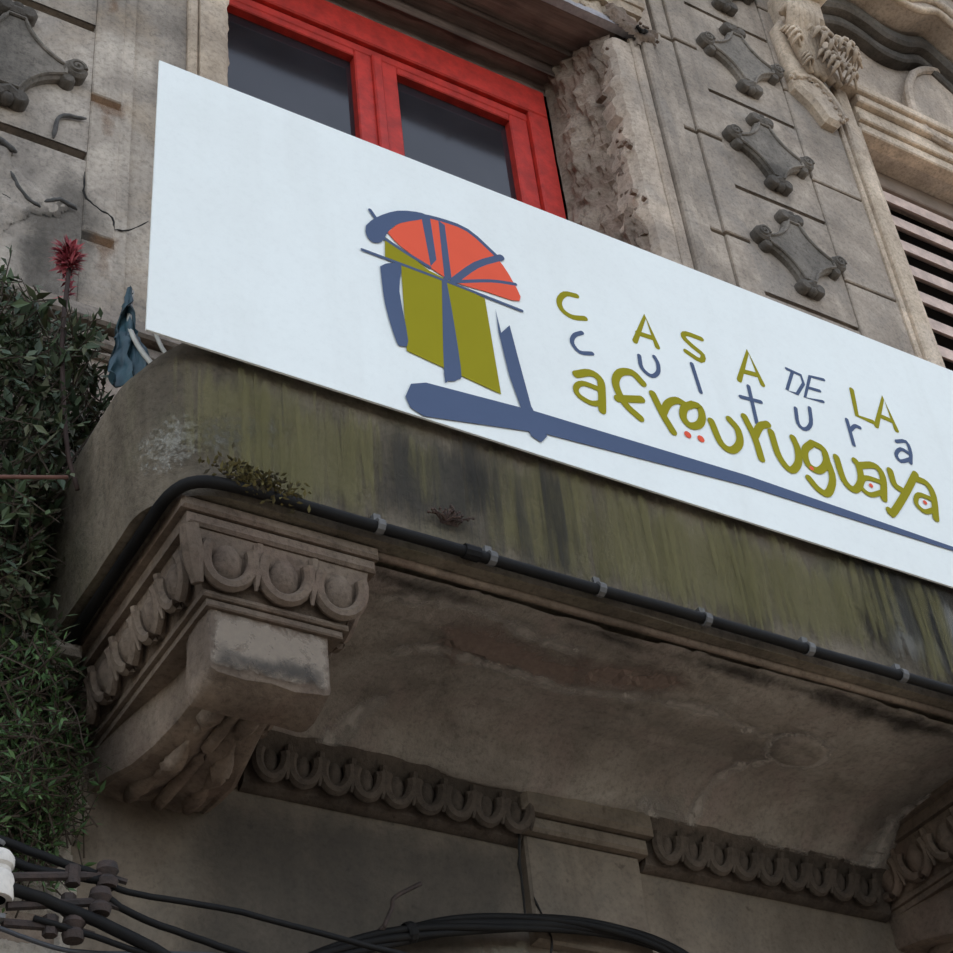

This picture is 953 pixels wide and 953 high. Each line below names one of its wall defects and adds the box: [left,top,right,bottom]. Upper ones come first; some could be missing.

crack [82,172,148,232]
leakage [845,555,953,672]
leakage [212,617,327,688]
leakage [816,692,940,732]